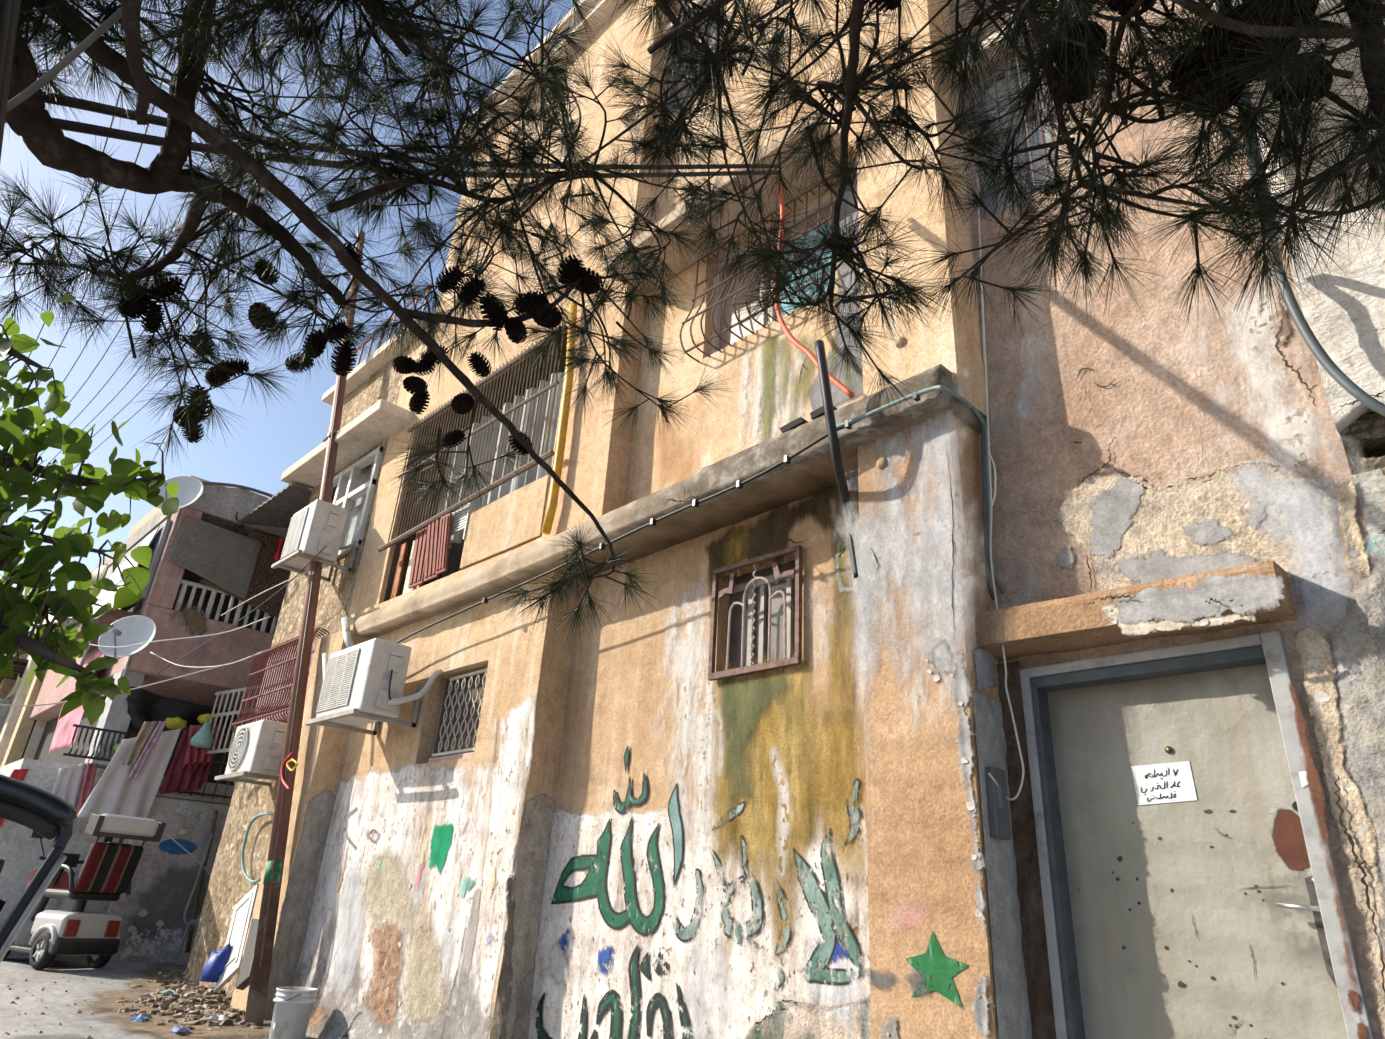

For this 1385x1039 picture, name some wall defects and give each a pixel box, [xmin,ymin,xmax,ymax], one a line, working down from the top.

flaking render [1053,464,1370,635]
leakage [665,478,870,948]
crack [1334,776,1385,993]
flaking render [745,995,899,1039]
leakage [816,964,851,1031]
flaking render [970,972,995,1039]